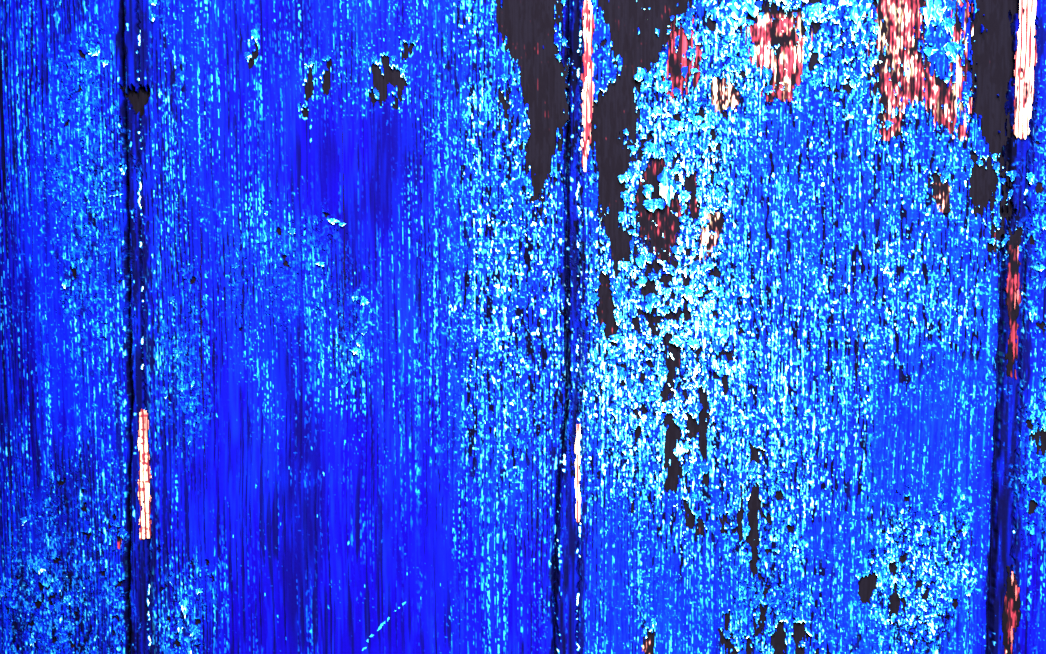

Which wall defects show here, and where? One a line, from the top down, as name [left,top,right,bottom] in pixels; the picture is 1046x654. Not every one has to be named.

peeling [244,29,259,69]
peeling [297,54,331,118]
peeling [365,34,420,111]
peeling [490,0,570,223]
peeling [587,0,973,537]
peeling [642,618,657,654]
peeling [717,438,823,654]
peeling [856,487,972,645]